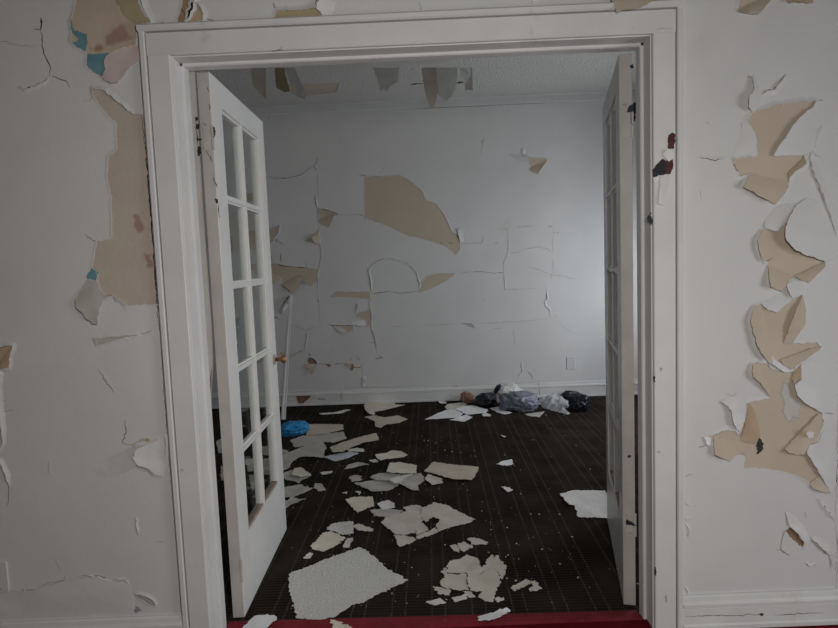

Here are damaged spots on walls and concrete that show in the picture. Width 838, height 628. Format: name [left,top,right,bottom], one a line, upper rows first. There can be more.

peeling [175,0,210,22]
peeling [735,0,816,17]
crack [2,17,70,92]
peeling [66,0,162,324]
peeling [652,133,676,205]
peeling [248,219,256,251]
crack [246,161,322,307]
peeling [269,224,320,294]
crack [368,258,416,360]
peeling [356,172,462,255]
crack [442,225,571,343]
peeling [698,74,838,496]